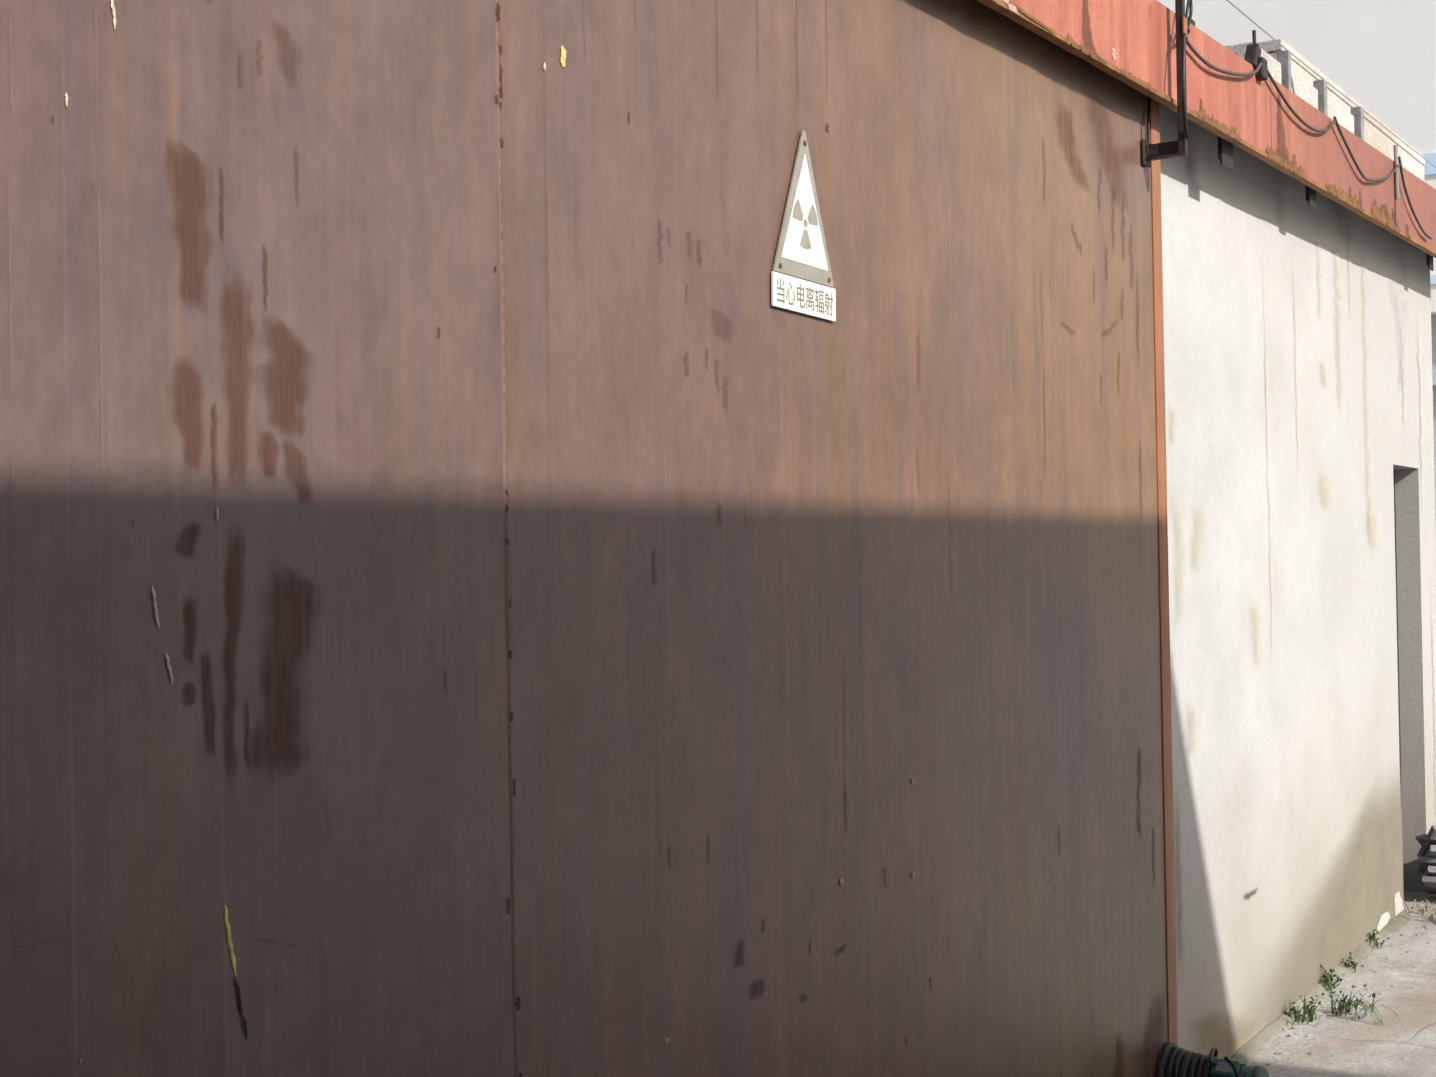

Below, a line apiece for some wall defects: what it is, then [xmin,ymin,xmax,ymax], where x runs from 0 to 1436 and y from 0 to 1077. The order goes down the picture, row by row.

corrosion [177,290,250,482]
corrosion [265,323,309,498]
corrosion [185,539,311,764]
peeling [224,905,236,976]